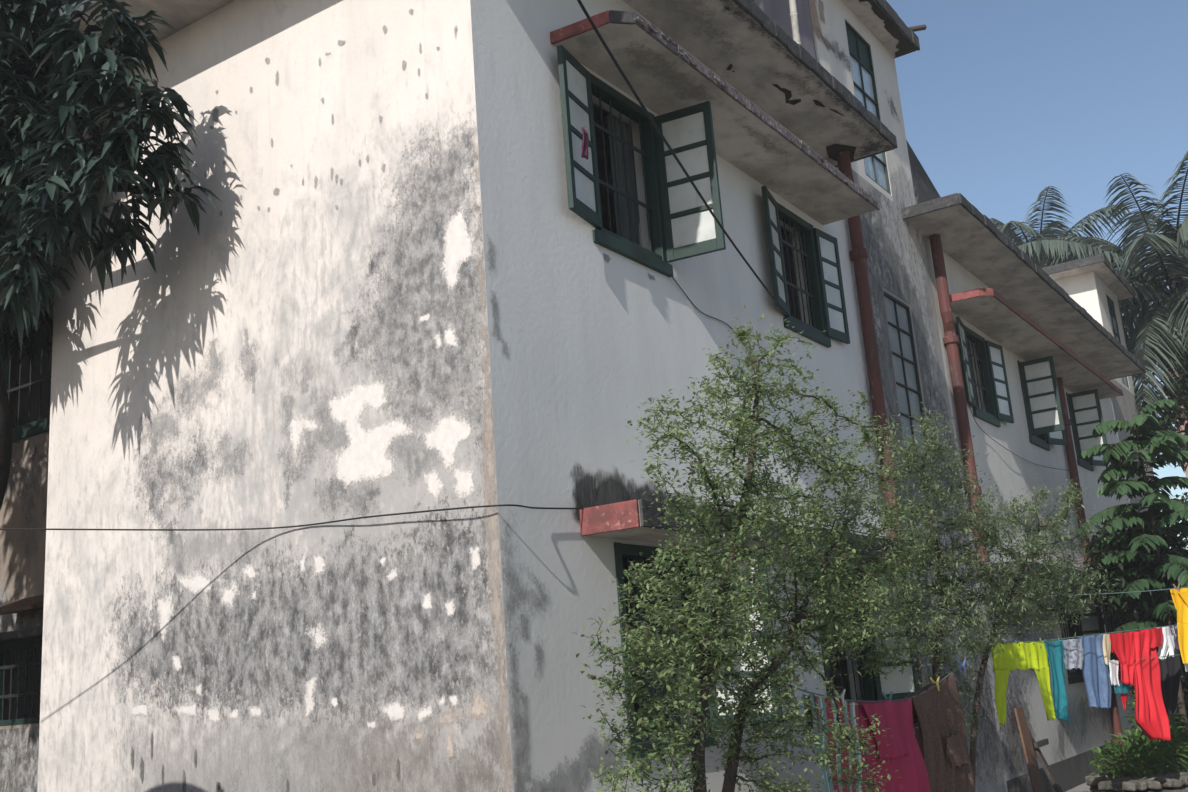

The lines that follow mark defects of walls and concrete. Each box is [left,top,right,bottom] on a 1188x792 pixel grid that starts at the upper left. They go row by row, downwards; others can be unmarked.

damp [720,0,892,157]
crack [772,84,844,116]
damp [337,130,507,445]
peeling [440,205,486,311]
damp [573,465,734,521]
damp [860,191,1058,785]
peeling [156,564,258,640]
damp [107,330,623,792]
peeling [289,325,512,792]
peeling [131,704,148,716]
peeling [174,684,262,722]